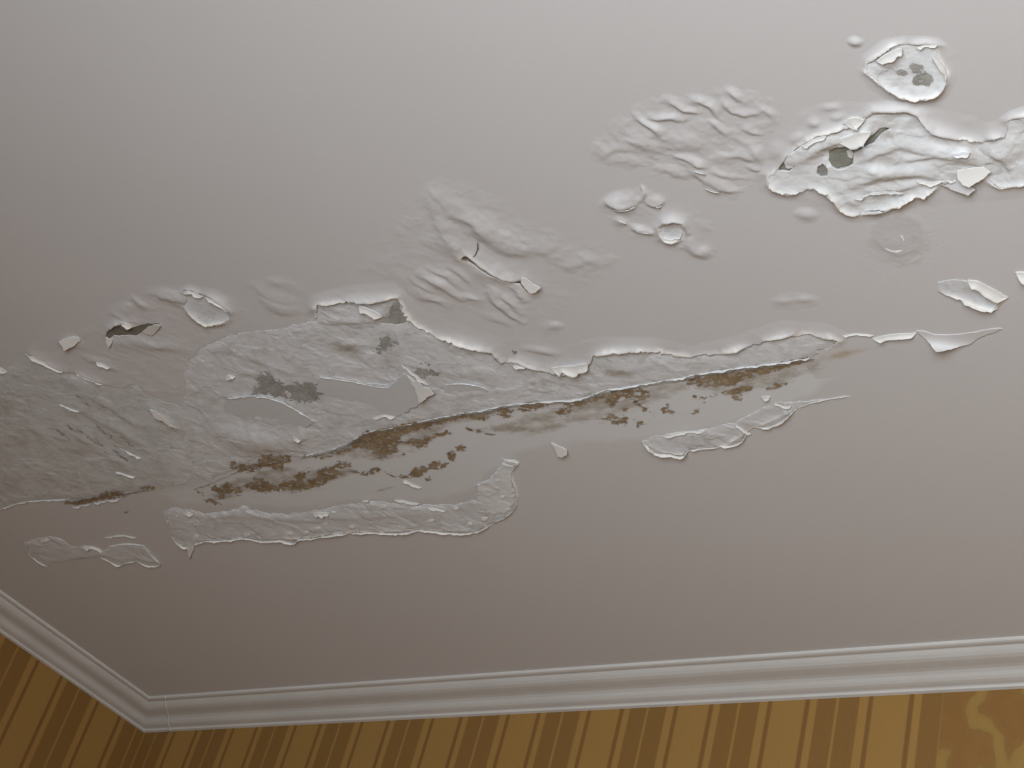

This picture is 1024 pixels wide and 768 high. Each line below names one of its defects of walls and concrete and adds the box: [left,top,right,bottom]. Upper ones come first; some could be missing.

peeling [752,35,1024,224]
peeling [938,279,1009,313]
corrosion [194,387,676,505]
peeling [0,290,1003,510]
corrosion [686,356,813,414]
peeling [25,535,161,568]
peeling [164,459,519,558]